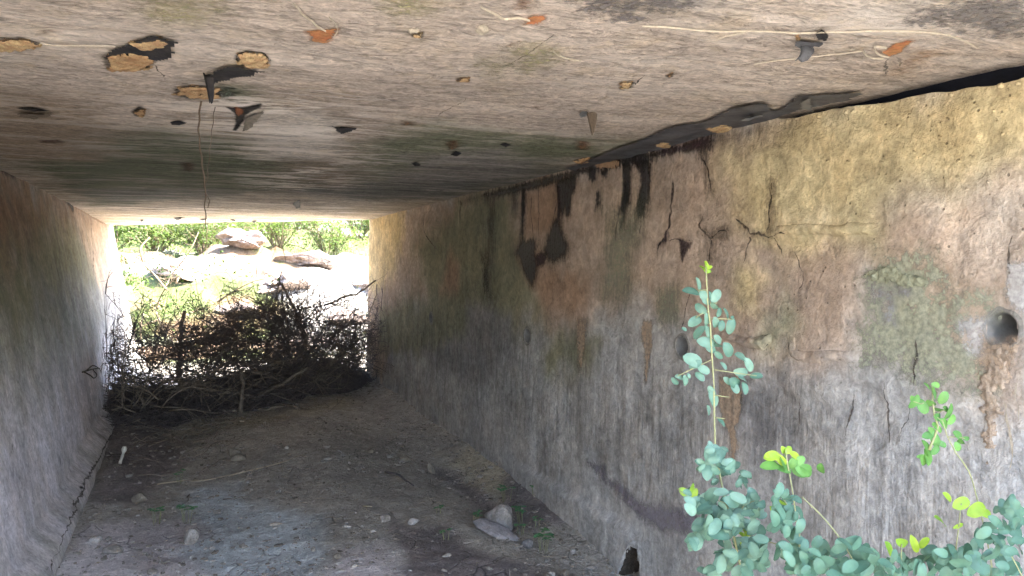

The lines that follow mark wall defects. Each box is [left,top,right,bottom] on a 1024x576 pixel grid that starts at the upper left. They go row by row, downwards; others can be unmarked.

spalling [0,37,43,53]
spalling [102,35,178,72]
spalling [235,51,271,69]
rust [293,3,339,43]
rust [475,2,545,36]
rust [863,41,914,74]
spalling [171,84,264,131]
water stain [615,153,651,240]
water stain [512,170,608,285]
crack [698,178,804,289]
efflorescence [1007,263,1024,312]
crack [51,432,113,570]